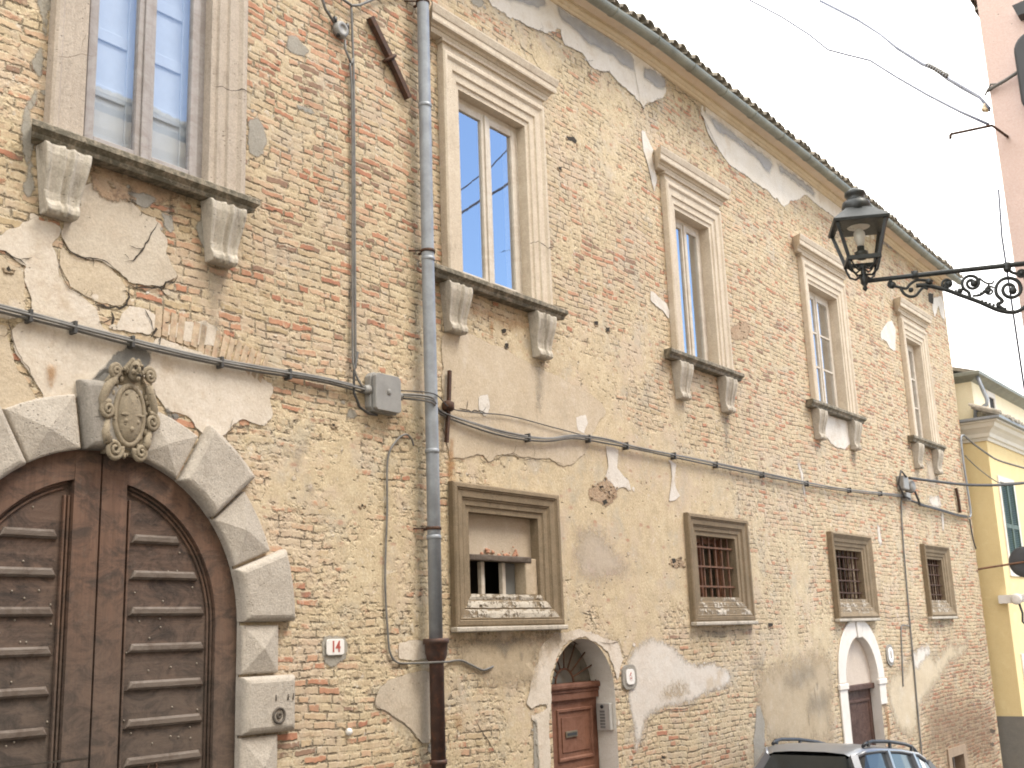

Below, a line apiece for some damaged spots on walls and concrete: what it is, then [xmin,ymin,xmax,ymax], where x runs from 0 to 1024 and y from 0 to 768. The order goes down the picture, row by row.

peeling [483,0,666,108]
peeling [701,106,842,217]
crack [57,212,178,350]
peeling [0,164,273,436]
crack [458,447,561,464]
peeling [588,446,635,507]
peeling [375,640,431,743]
peeling [457,629,731,768]